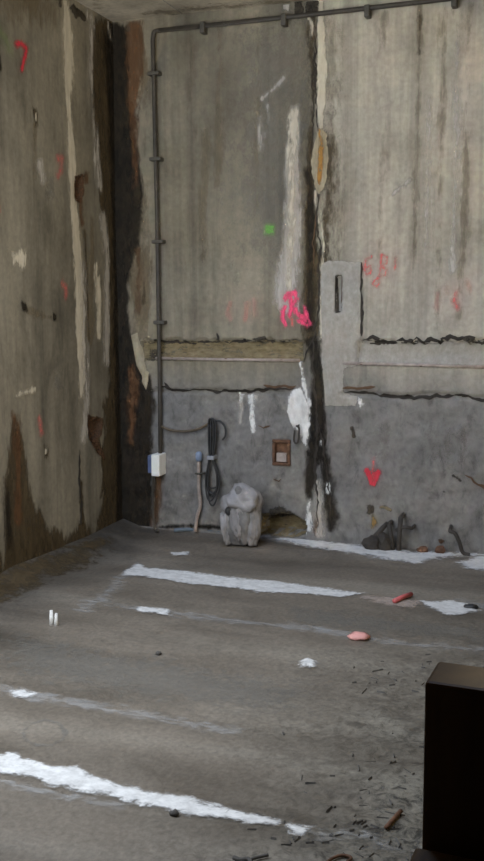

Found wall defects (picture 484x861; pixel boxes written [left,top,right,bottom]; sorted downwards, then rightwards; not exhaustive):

crack [309,6,319,154]
leakage [276,1,339,537]
corrosion [127,367,139,444]
spalling [131,333,304,389]
crack [155,194,364,532]
crack [343,386,484,402]
corrosion [4,415,48,570]